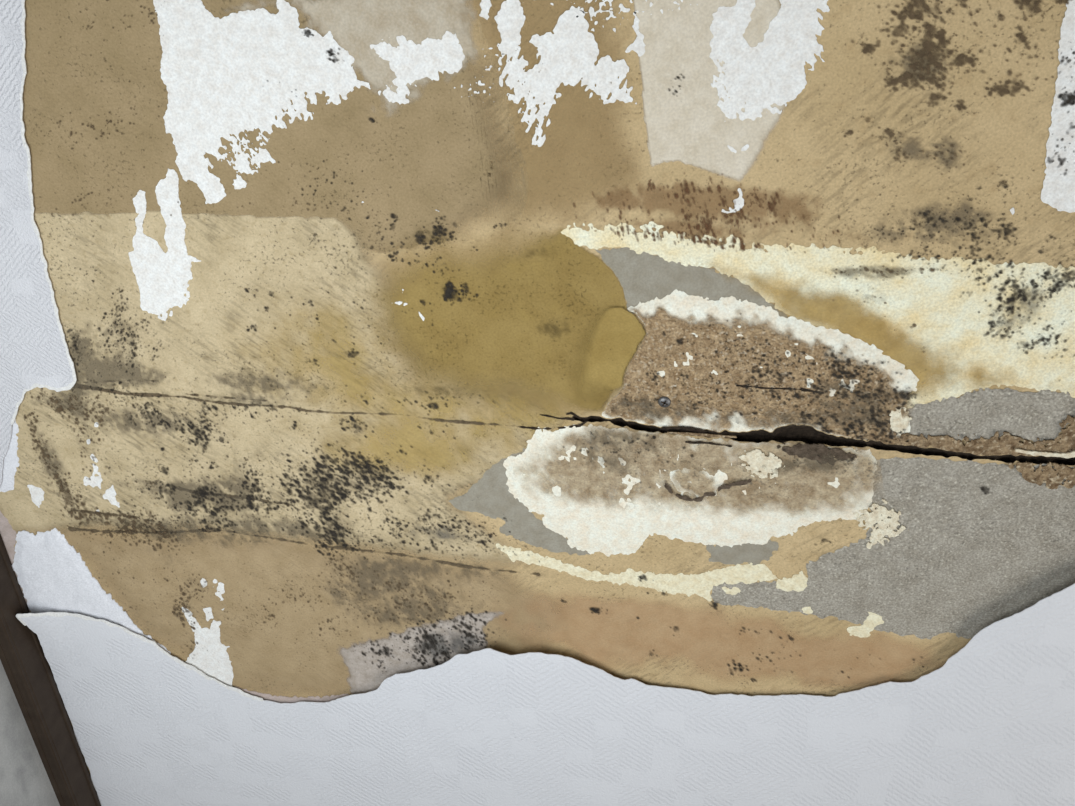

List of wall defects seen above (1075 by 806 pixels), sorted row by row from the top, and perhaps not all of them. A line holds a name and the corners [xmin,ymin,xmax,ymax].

water stain [23,0,627,433]
peeling [128,0,698,321]
peeling [709,0,830,122]
water stain [852,0,1053,113]
water stain [834,188,1075,354]
peeling [1041,0,1075,213]
crack [76,380,390,415]
water stain [24,280,946,692]
crack [429,412,1075,466]
crack [736,385,824,394]
spalling [503,289,1075,557]
peeling [340,612,502,694]